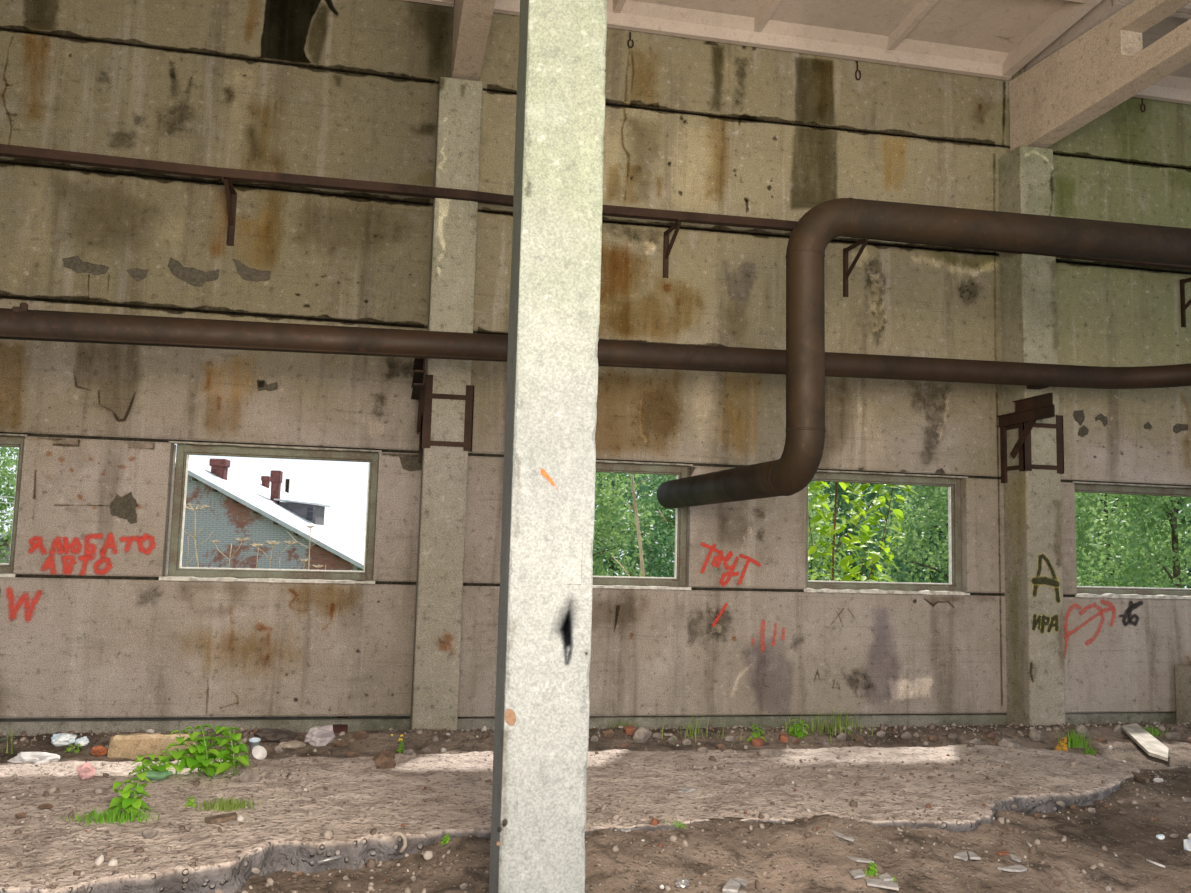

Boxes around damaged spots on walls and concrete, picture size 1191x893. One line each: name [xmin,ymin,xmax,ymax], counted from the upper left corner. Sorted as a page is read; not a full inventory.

peeling [1073,410,1107,437]
peeling [1173,424,1188,433]